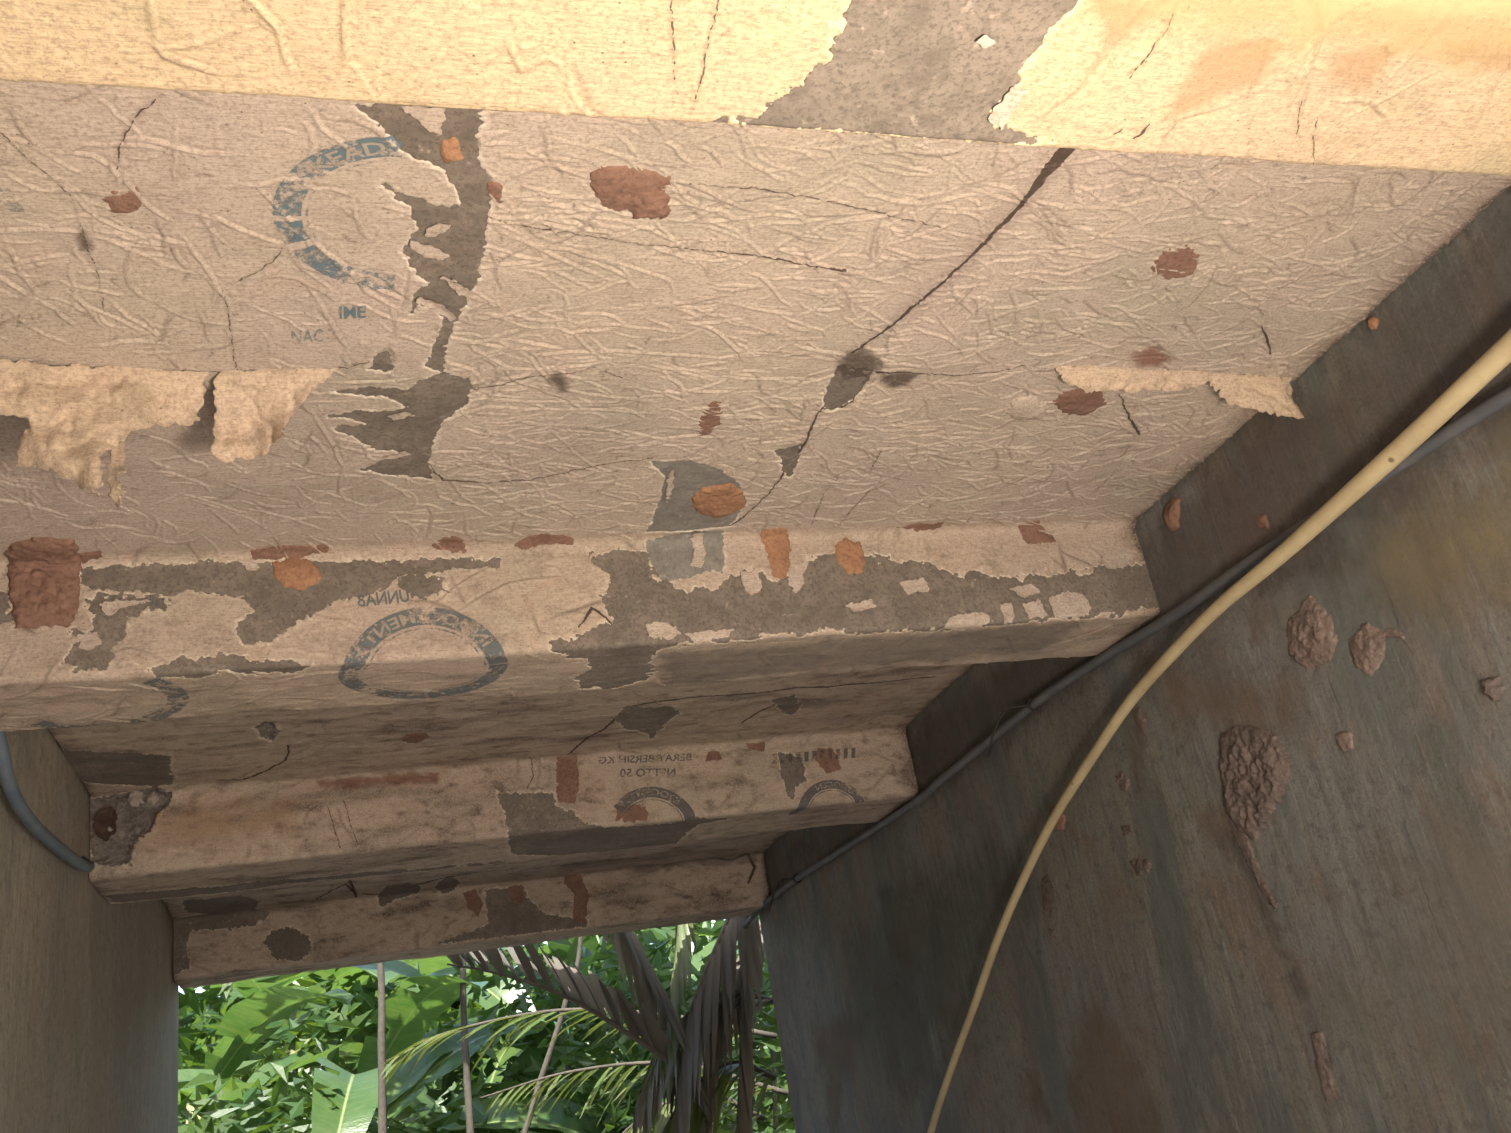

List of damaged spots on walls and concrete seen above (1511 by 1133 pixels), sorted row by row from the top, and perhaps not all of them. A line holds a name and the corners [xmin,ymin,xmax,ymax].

peeling [713,0,1078,145]
peeling [328,103,492,479]
crack [673,148,1075,526]
peeling [0,591,15,629]
peeling [61,557,501,678]
peeling [549,460,1159,690]
spalling [61,750,175,867]
peeling [100,791,730,975]